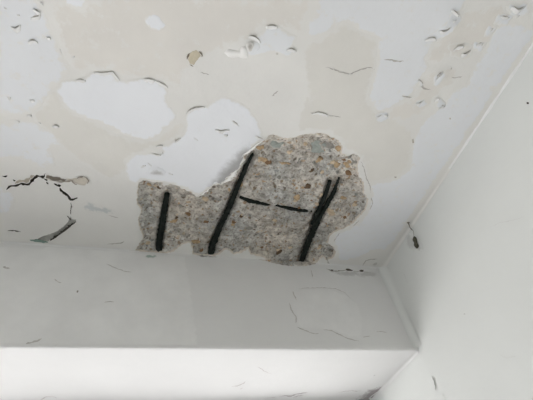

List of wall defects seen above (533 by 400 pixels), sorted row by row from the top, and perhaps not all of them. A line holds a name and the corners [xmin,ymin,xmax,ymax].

crack [328,67,372,75]
spalling [44,0,467,266]
crack [3,174,77,220]